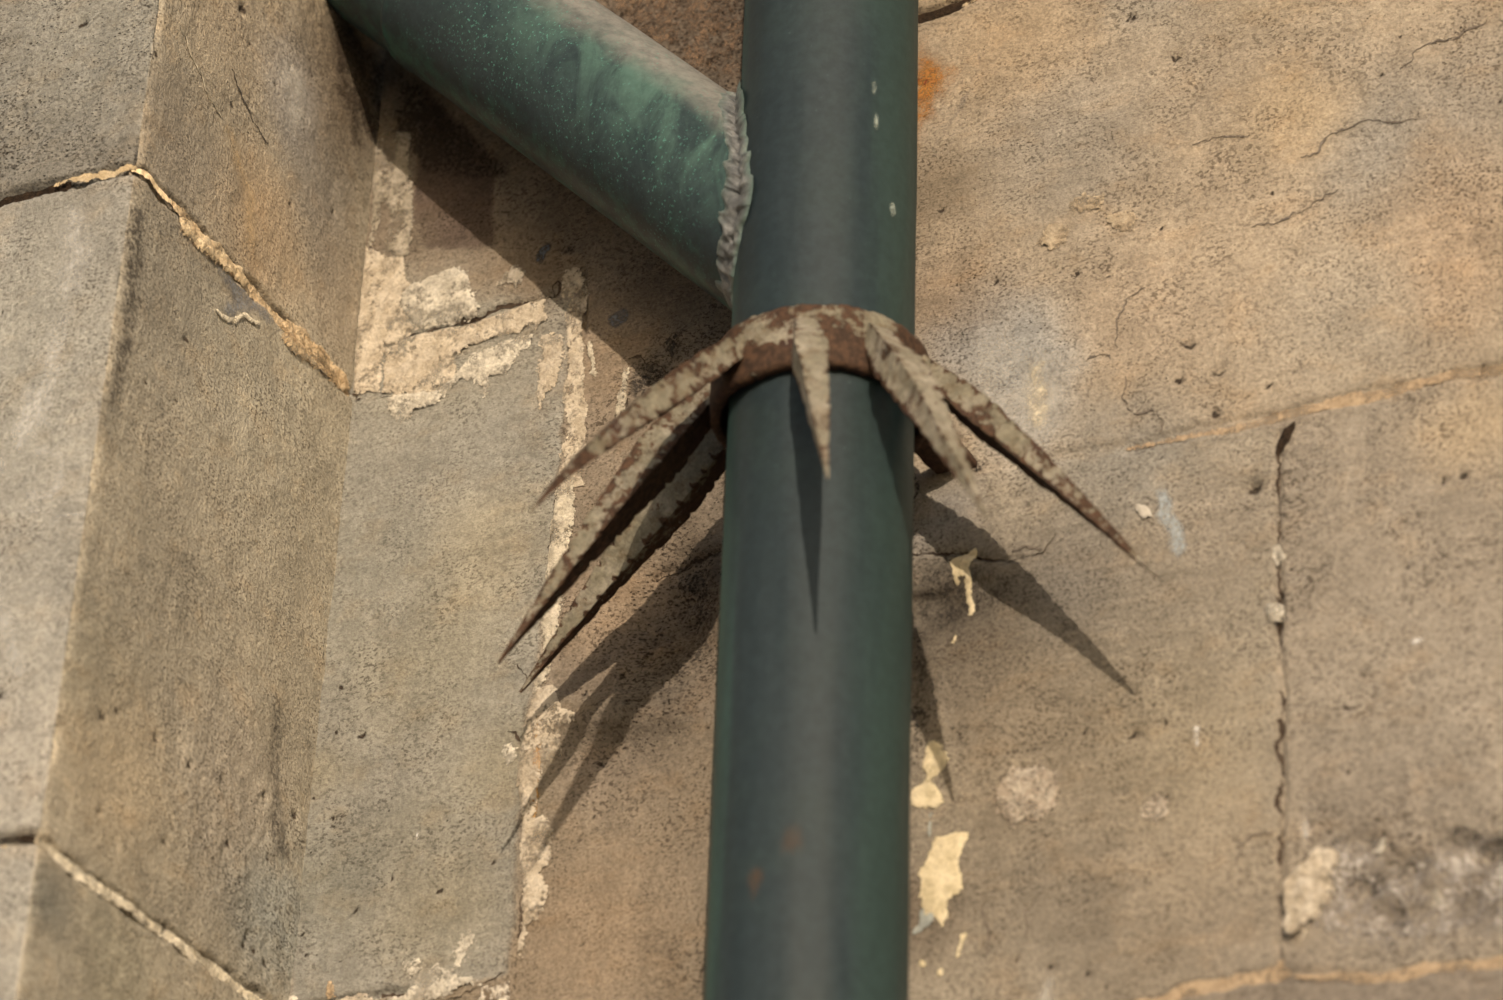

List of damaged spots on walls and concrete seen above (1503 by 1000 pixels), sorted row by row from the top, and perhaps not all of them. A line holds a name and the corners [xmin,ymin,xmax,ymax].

corrosion [918,59,943,118]
crack [1301,118,1417,158]
crack [1399,19,1503,70]
crack [1251,189,1338,228]
spalling [179,217,266,325]
peeling [282,130,573,423]
peeling [545,474,576,581]
crack [1275,421,1295,647]
peeling [501,597,575,958]
peeling [910,740,949,809]
crack [1236,691,1287,881]
peeling [917,832,968,927]